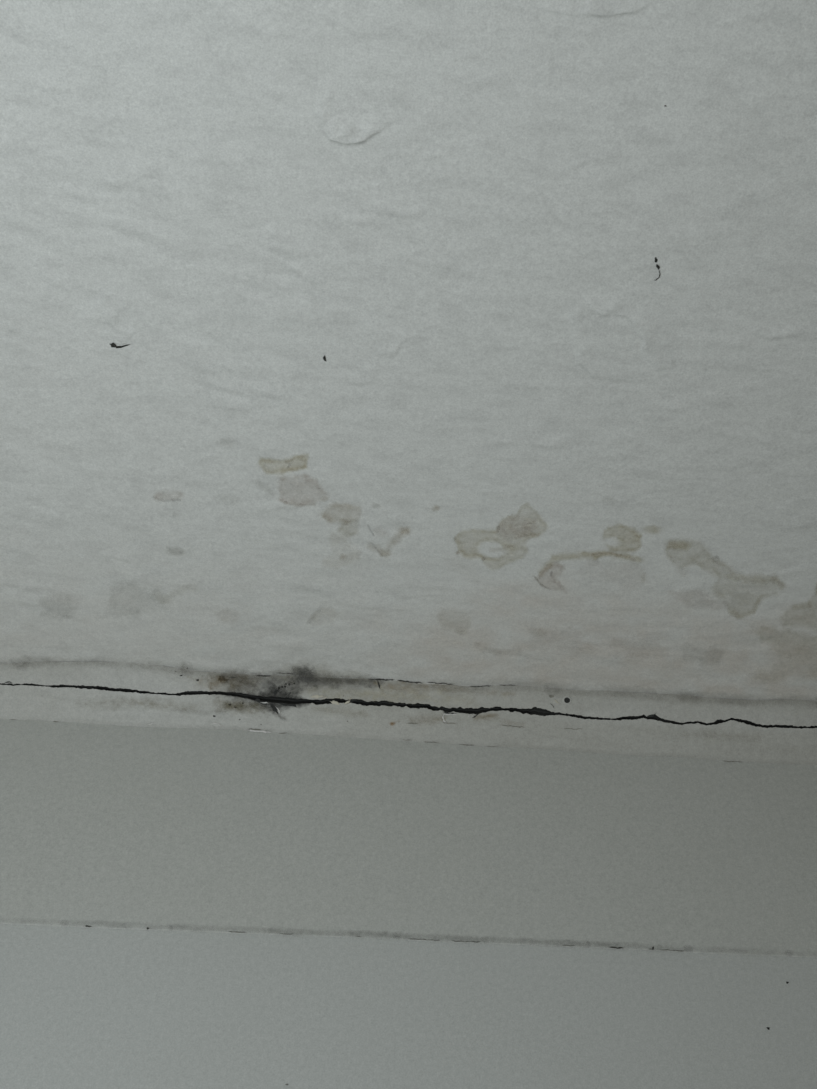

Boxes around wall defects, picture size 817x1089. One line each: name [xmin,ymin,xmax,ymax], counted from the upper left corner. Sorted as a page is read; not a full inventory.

crack [0,673,817,747]